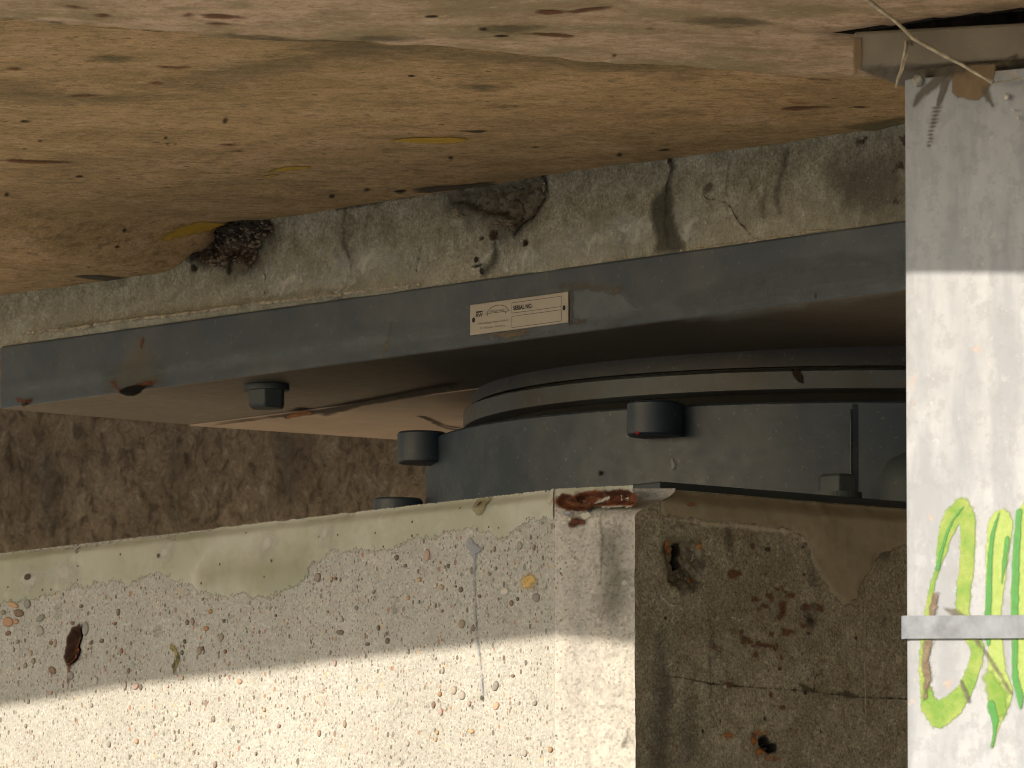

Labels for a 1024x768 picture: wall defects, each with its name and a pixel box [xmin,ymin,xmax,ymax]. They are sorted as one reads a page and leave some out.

spalling [186,220,274,275]
spalling [449,175,548,239]
water stain [473,188,707,276]
crack [703,184,746,229]
rust [111,361,156,396]
peeling [0,485,637,605]
peeling [660,491,907,606]
crack [668,672,908,699]